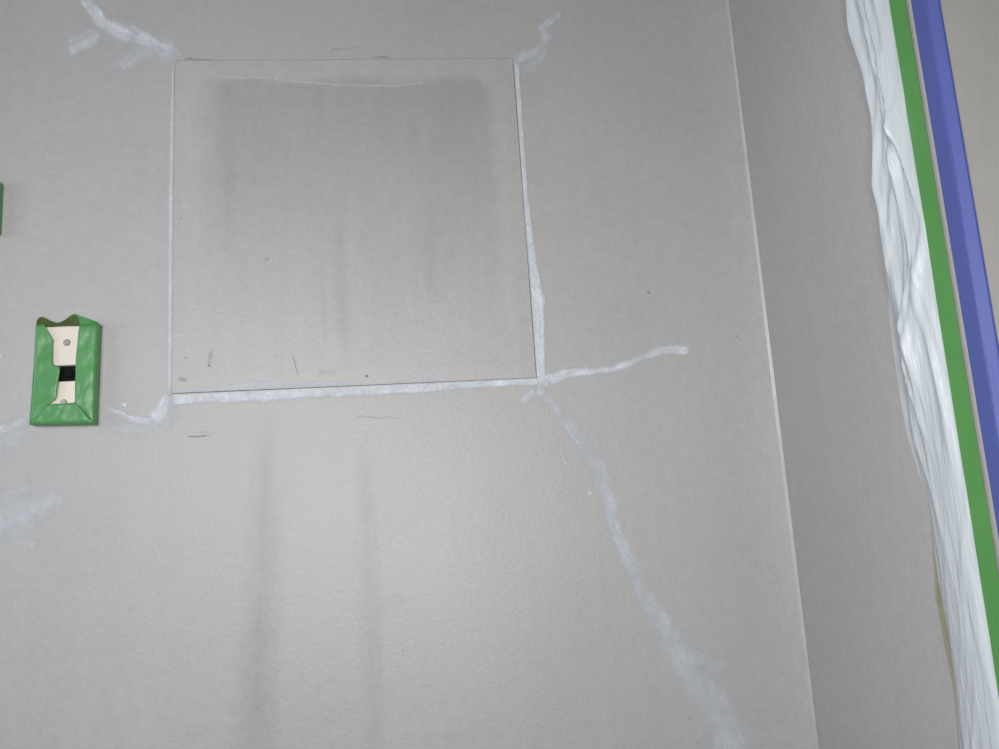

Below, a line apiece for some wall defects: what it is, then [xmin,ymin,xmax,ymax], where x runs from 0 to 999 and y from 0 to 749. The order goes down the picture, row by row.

crack [69,0,180,69]
crack [518,13,560,61]
crack [106,393,171,430]
crack [521,345,689,448]
crack [603,484,744,749]